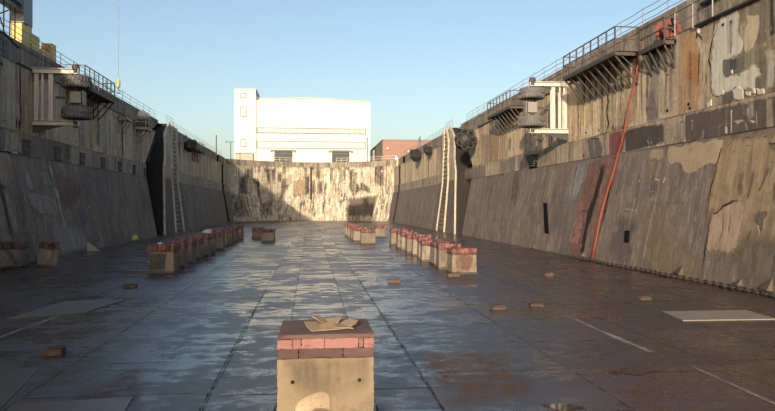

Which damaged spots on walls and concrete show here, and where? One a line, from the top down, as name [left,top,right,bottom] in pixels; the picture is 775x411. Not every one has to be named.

peeling [0,129,21,235]
leakage [230,167,289,215]
leakage [346,166,385,216]
corrosion [571,157,618,259]
peeling [639,9,775,254]
crack [702,136,767,268]
peeling [295,392,331,411]